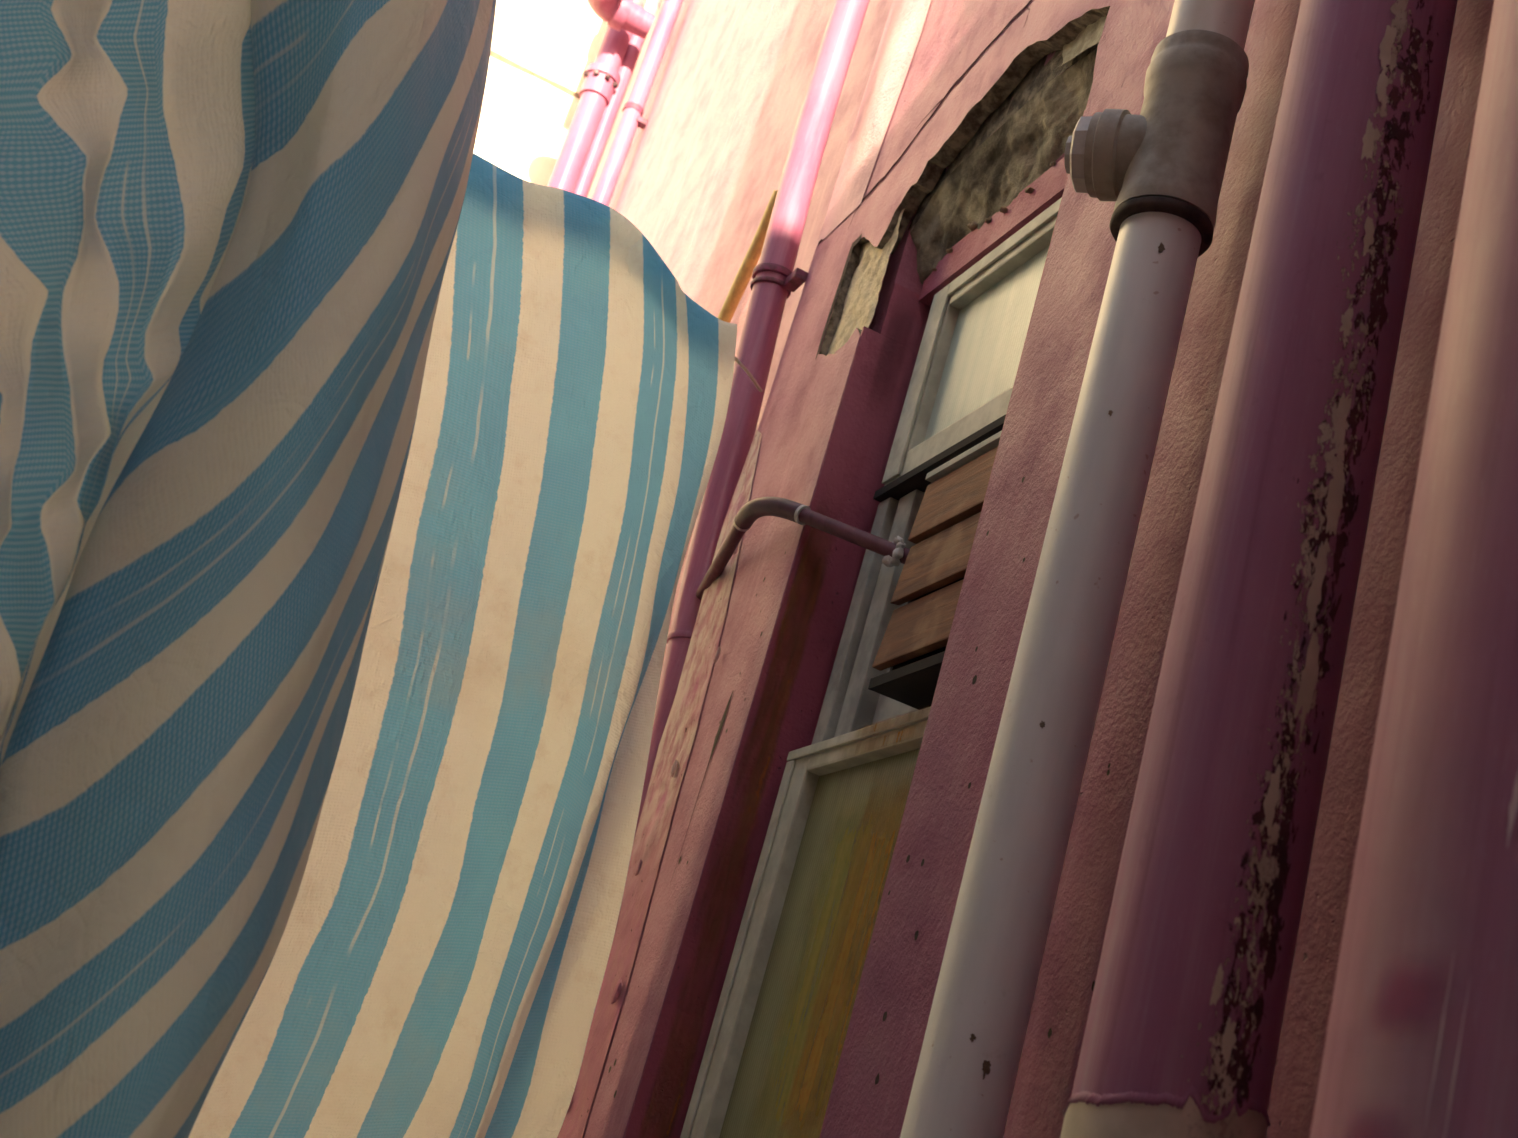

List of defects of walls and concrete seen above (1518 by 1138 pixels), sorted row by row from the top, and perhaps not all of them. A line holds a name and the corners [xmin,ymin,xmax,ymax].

spalling [815,16,1107,359]
peeling [1060,0,1438,1138]